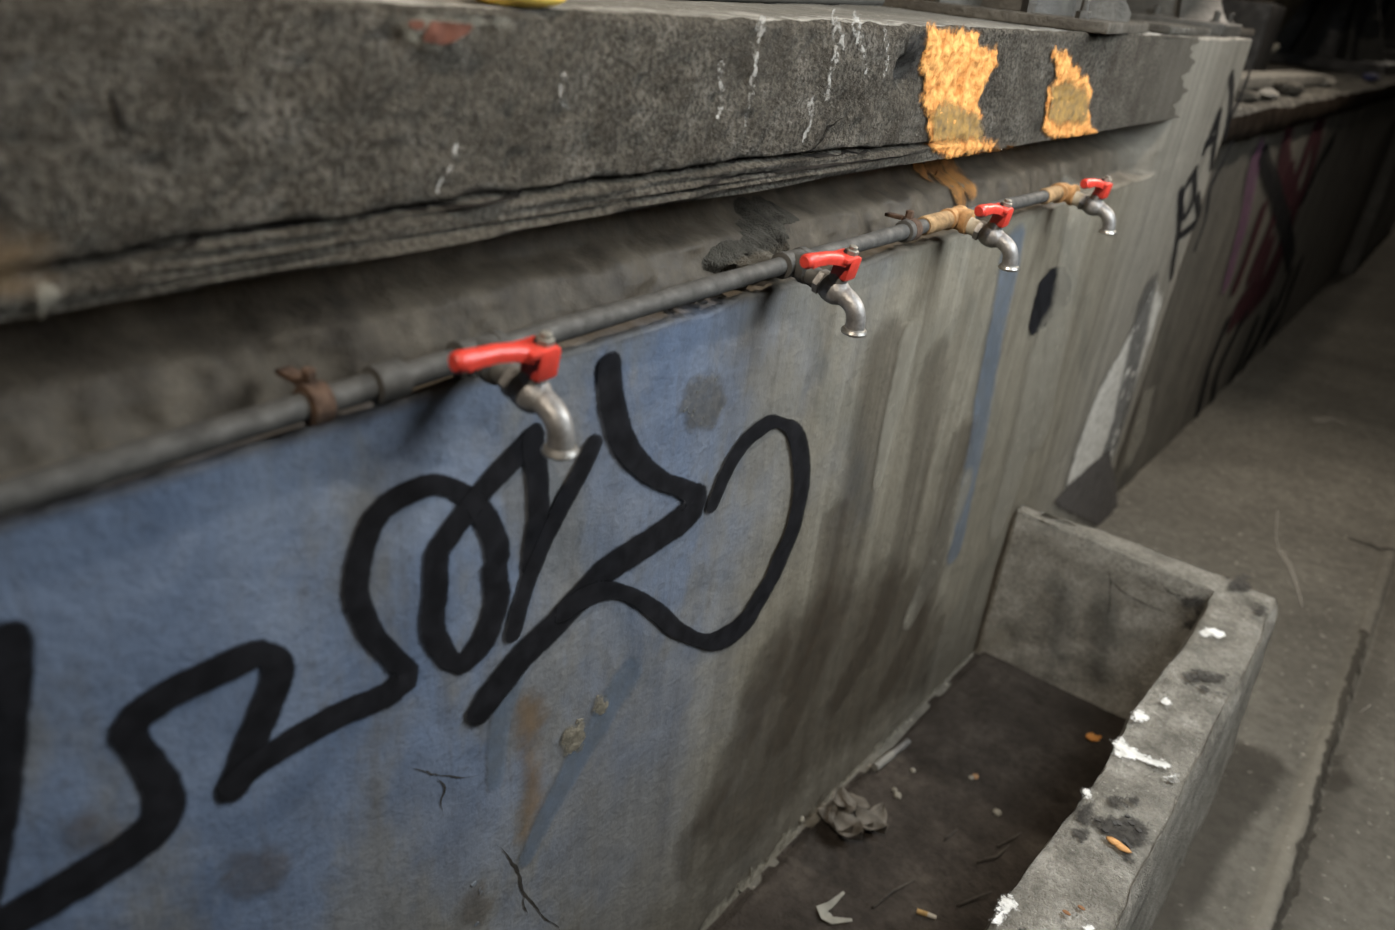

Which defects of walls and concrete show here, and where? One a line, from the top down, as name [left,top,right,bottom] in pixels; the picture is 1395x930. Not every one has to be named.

rust [911,22,1013,236]
rust [1043,48,1098,139]
damp [874,325,918,487]
damp [991,205,1088,535]
damp [905,475,970,626]